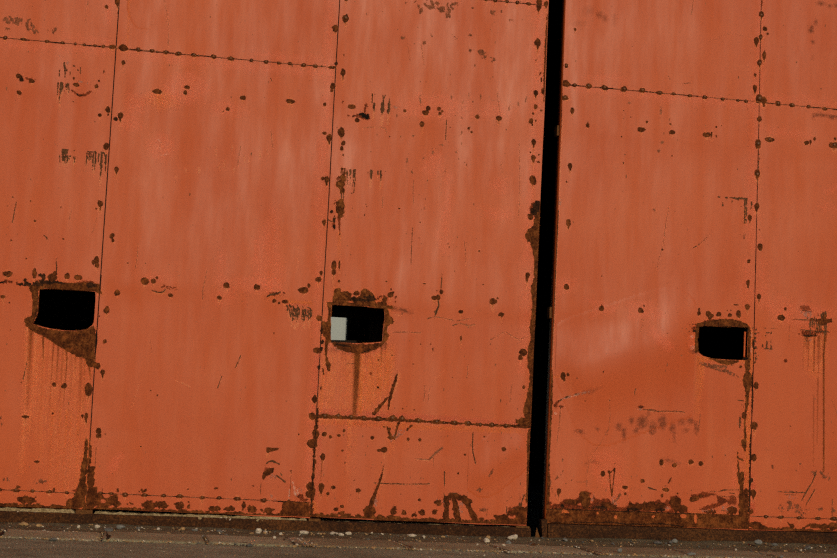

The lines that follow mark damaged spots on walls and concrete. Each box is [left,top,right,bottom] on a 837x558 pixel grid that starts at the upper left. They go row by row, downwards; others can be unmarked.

rust [555,199,571,290]
rust [0,201,540,525]
rust [546,297,837,532]